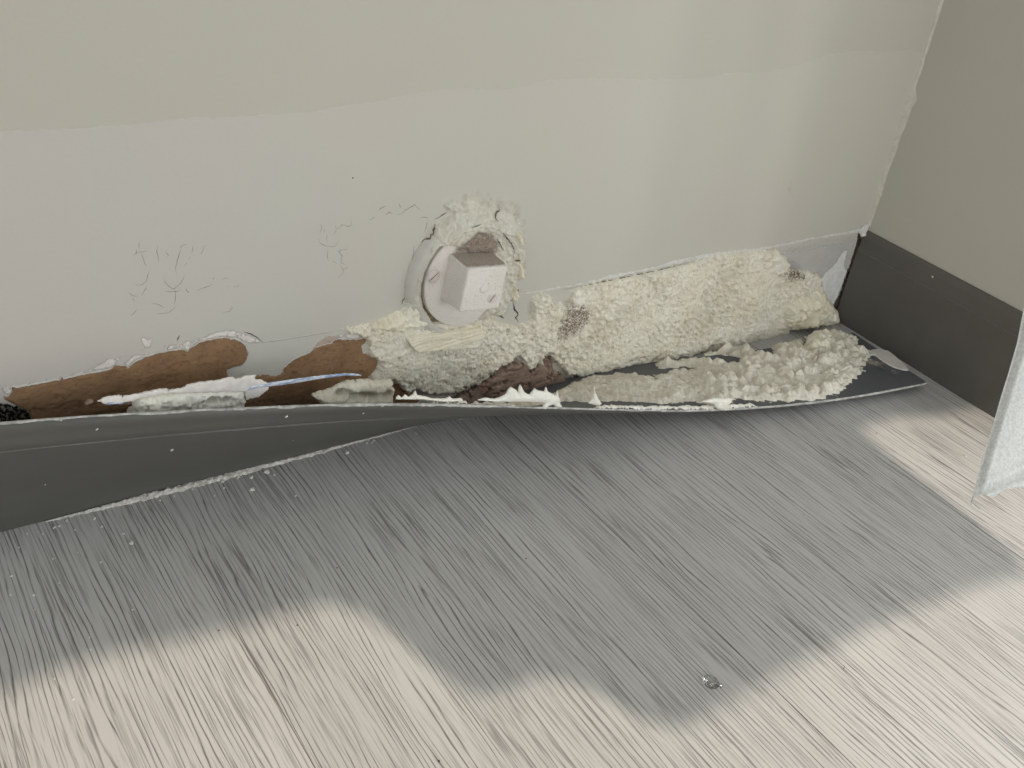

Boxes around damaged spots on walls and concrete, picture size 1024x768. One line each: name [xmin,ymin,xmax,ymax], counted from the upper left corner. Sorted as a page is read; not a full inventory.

crack [318,204,447,275]
crack [129,244,238,341]
spalling [0,403,32,422]